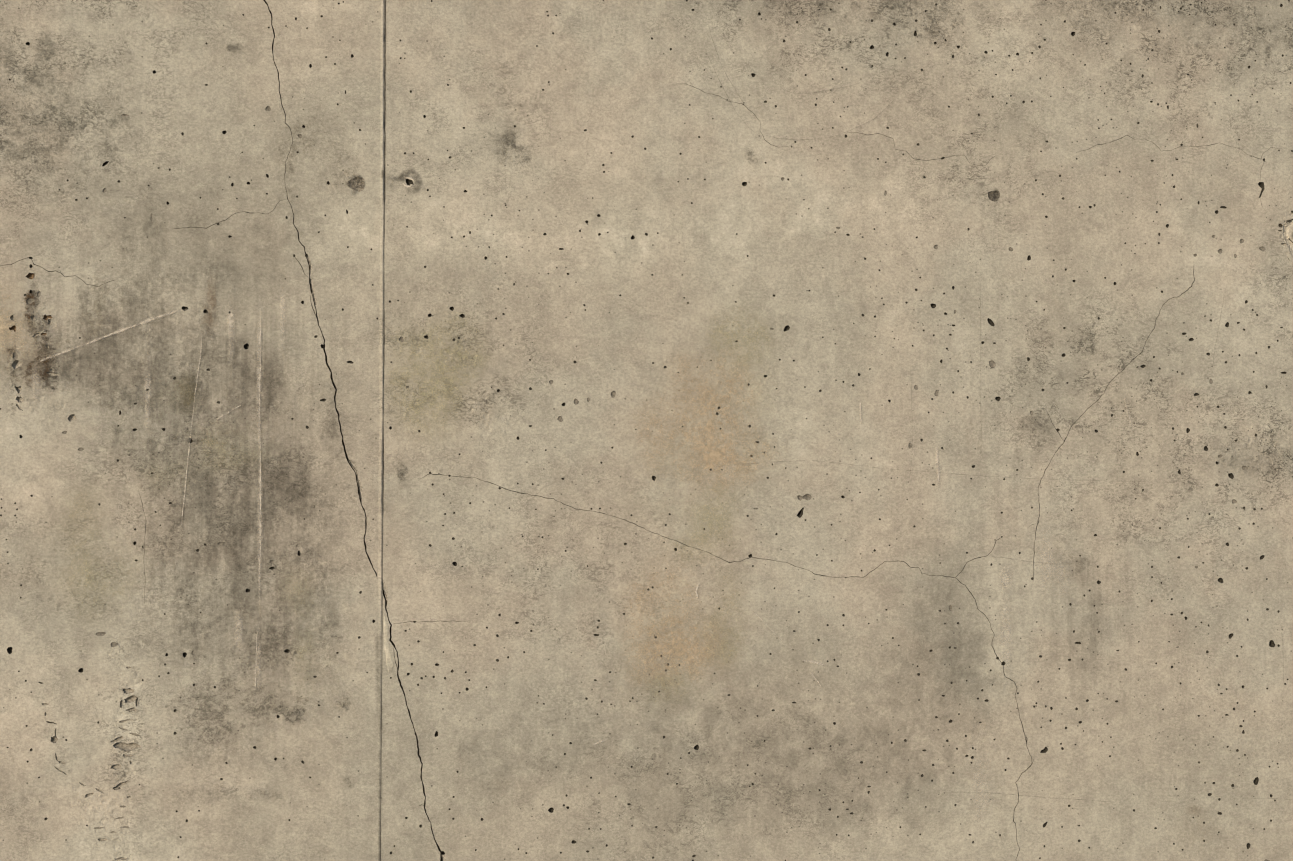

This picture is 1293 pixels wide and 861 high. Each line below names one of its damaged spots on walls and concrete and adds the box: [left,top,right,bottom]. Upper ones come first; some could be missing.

crack [177,0,459,861]
crack [1032,270,1195,580]
spalling [1276,203,1293,273]
crack [424,474,1033,856]